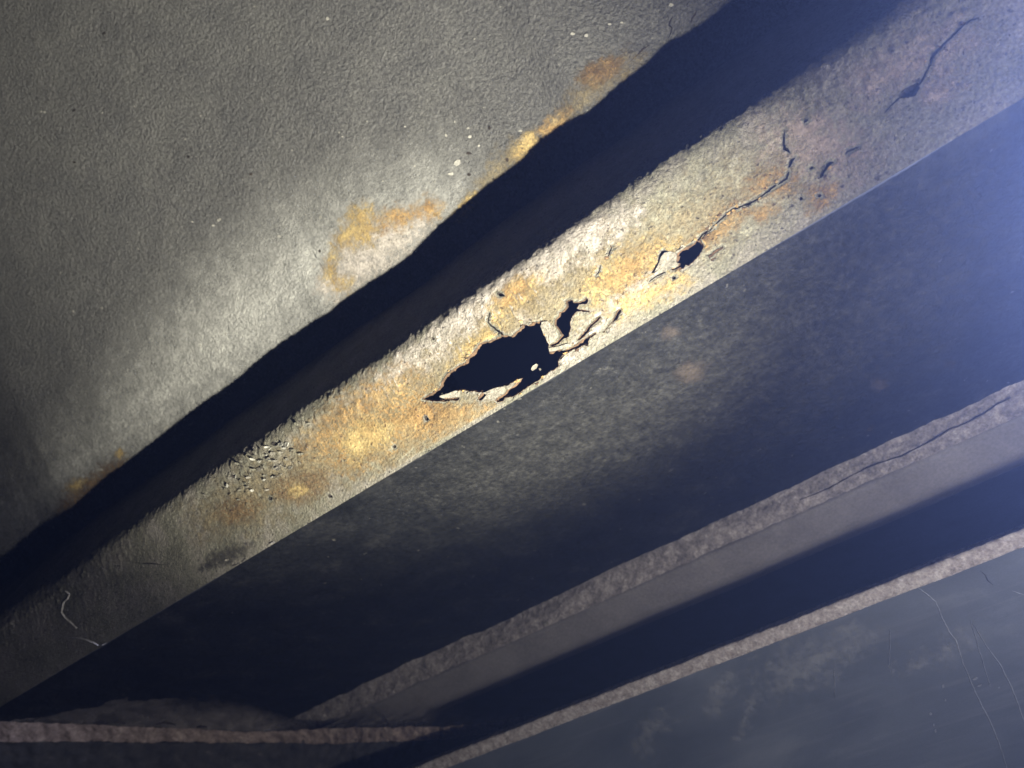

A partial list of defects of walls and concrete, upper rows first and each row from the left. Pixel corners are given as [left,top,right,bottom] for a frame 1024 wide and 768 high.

corrosion [454,56,630,224]
crack [698,132,795,243]
crack [885,16,979,112]
peeling [367,204,684,403]
corrosion [192,113,872,539]